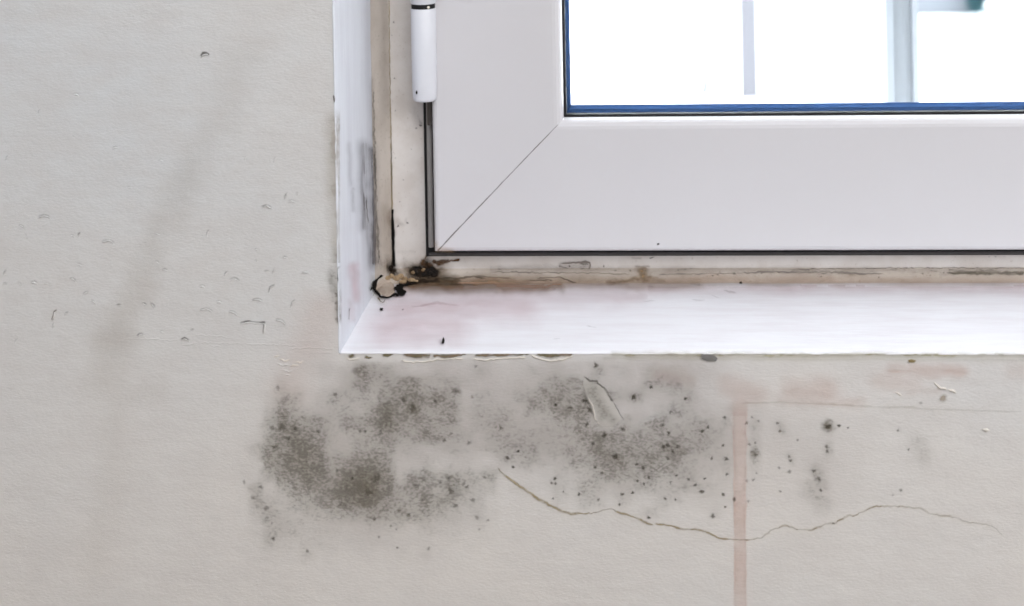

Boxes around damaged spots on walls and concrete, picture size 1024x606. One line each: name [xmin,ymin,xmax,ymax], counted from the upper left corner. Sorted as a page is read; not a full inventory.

leakage [361,129,576,289]
leakage [379,393,440,428]
peeling [583,377,621,427]
leakage [266,414,321,483]
leakage [337,465,389,508]
crack [500,471,751,540]